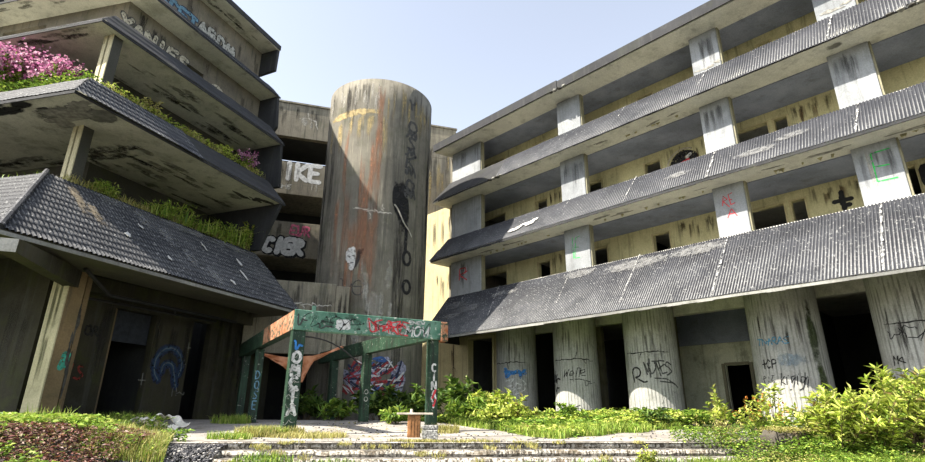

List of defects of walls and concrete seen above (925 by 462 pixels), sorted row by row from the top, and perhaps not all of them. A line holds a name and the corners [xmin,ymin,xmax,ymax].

water stain [0,101,68,119]
peeling [481,217,538,254]